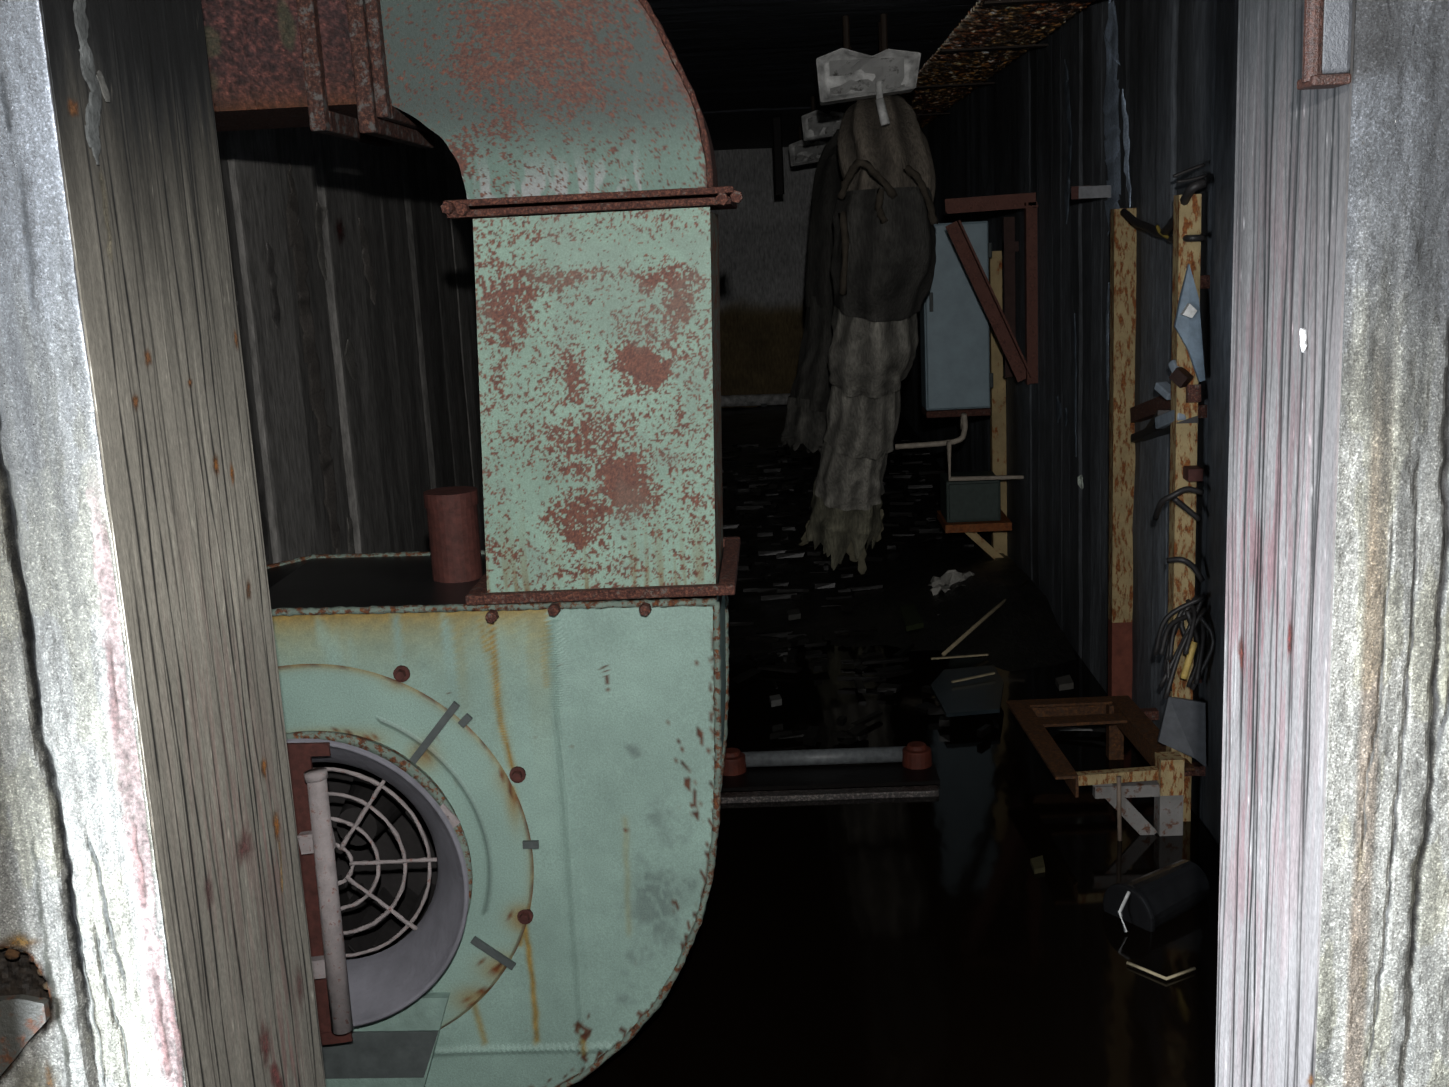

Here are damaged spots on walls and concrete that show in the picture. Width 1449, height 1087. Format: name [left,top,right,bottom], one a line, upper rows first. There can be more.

crack [0,422,131,1087]
crack [1363,363,1449,1065]